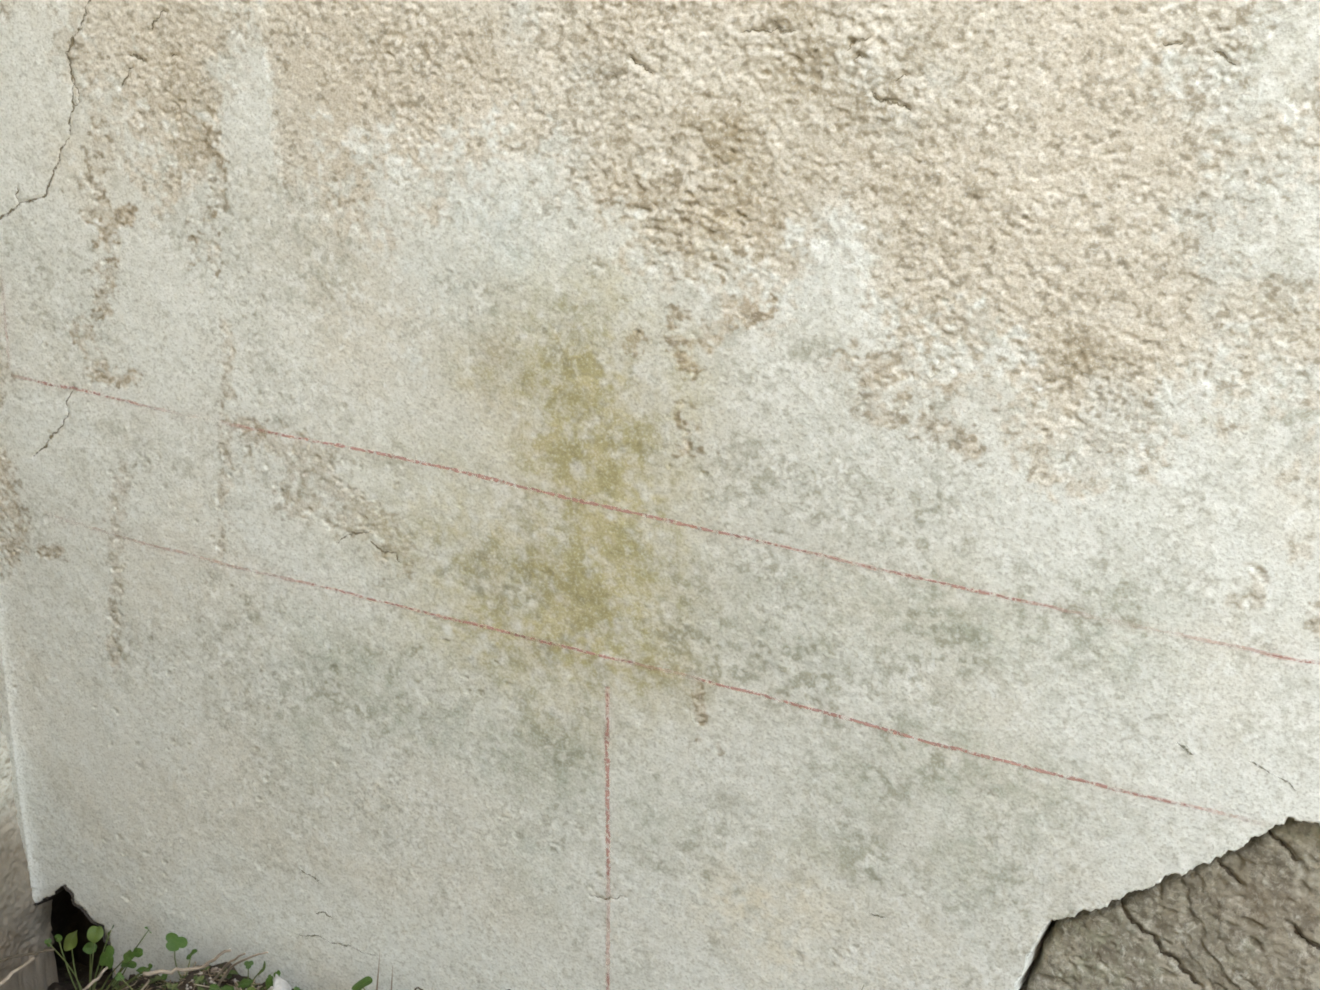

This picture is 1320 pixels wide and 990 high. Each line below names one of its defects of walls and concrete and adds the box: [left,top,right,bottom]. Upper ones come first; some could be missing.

crack [0,0,91,220]
damp [197,11,1264,990]
flaking render [1019,817,1320,990]